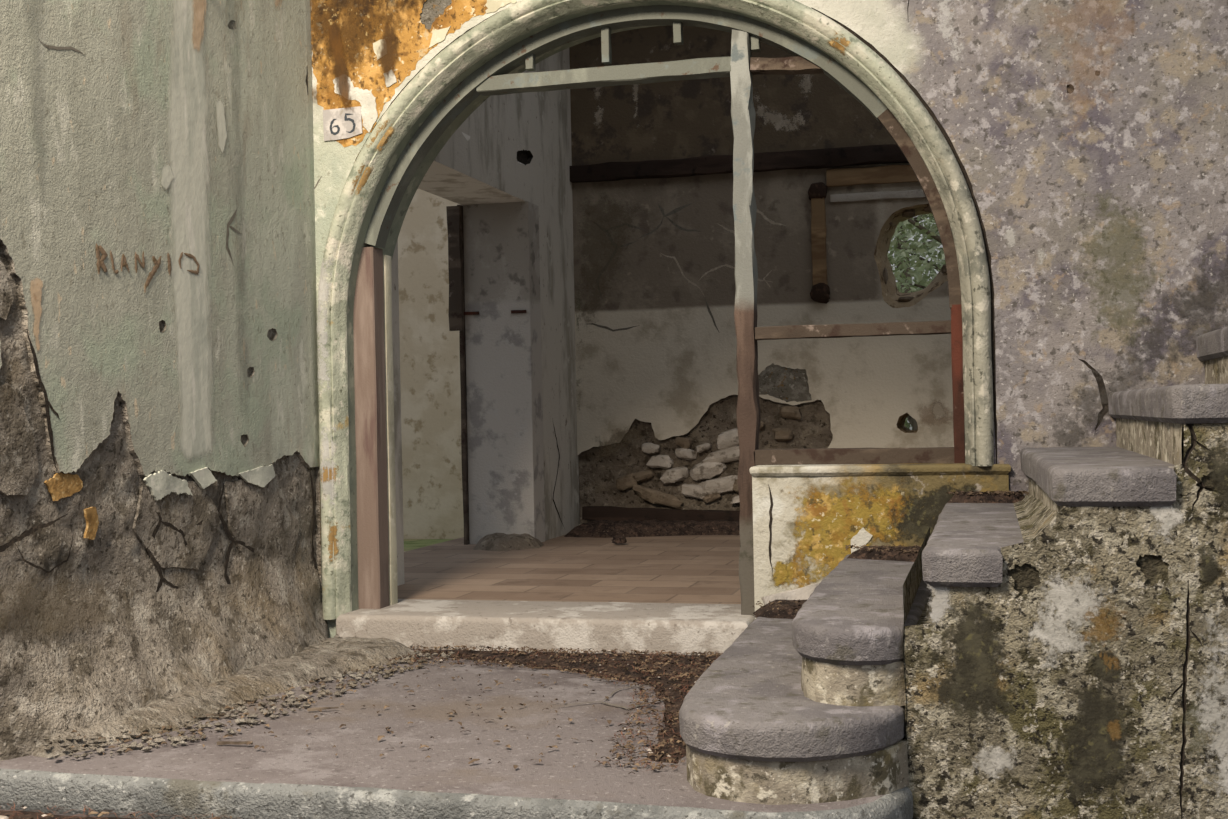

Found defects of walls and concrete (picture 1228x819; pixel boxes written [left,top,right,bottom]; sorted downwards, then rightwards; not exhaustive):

leakage [310,0,423,109]
peeling [311,0,517,194]
spalling [517,149,533,165]
flaking render [0,0,339,604]
flaking render [578,395,740,524]
flaking render [758,363,833,449]
crack [1079,359,1109,430]
crack [1182,424,1219,512]
crack [147,484,260,592]
leakage [1197,545,1219,582]
leakage [1092,650,1121,684]
crack [1171,580,1203,819]